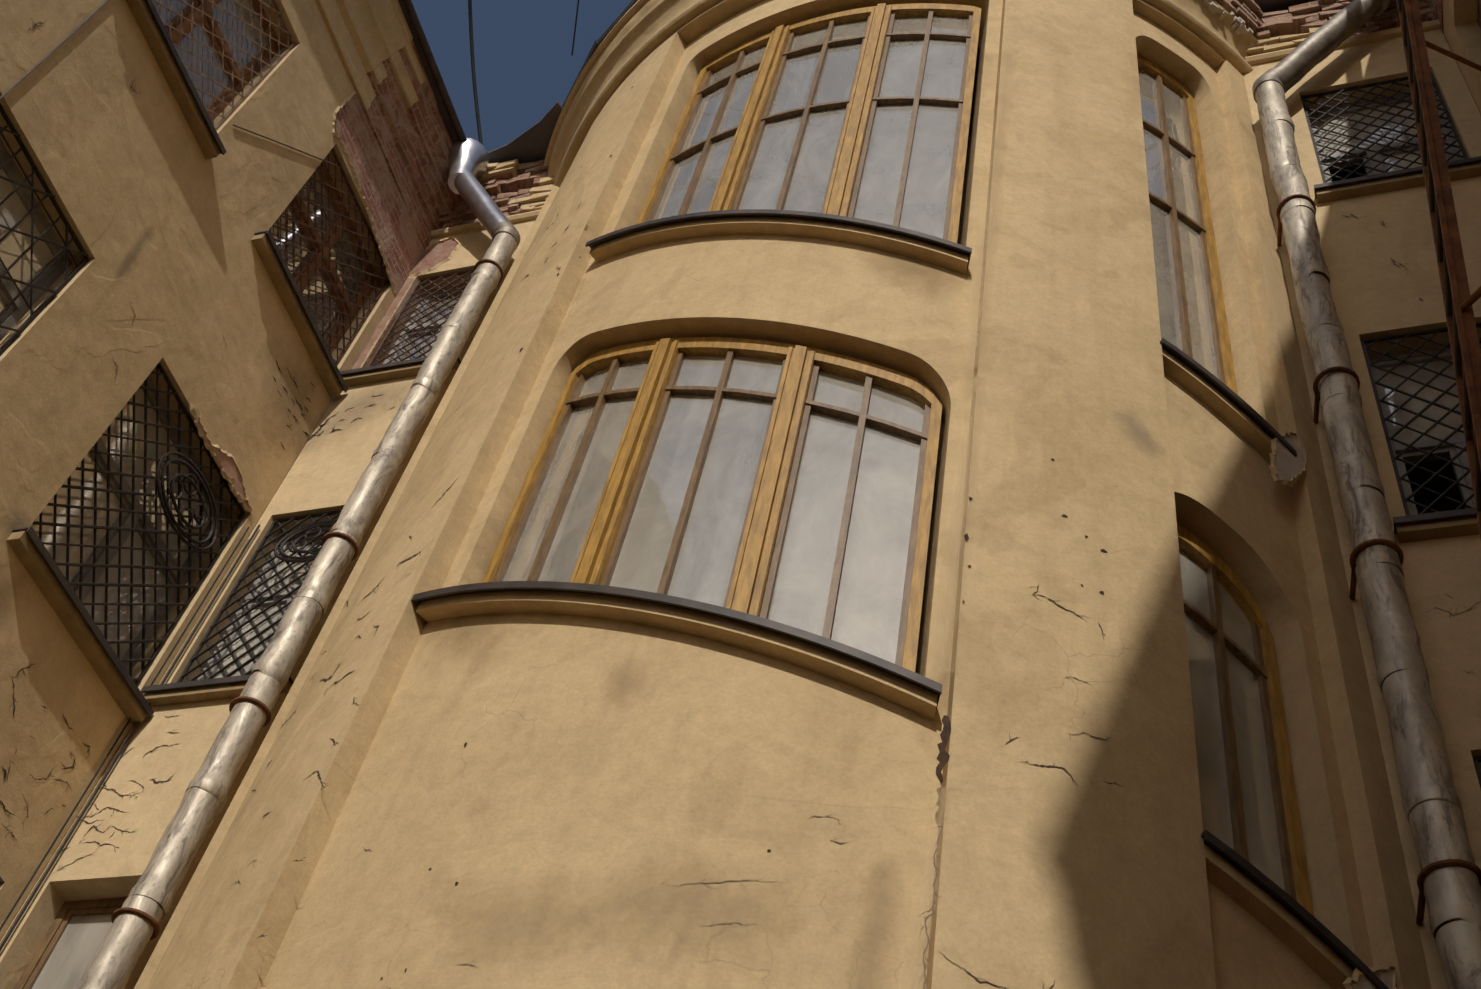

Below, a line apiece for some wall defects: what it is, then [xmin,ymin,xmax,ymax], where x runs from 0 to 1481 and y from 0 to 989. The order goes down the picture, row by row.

spalling [332,91,461,369]
crack [252,476,460,819]
crack [1030,585,1105,638]
crack [0,663,182,871]
crack [1006,732,1124,787]
crack [661,876,779,926]
crack [917,808,1055,989]